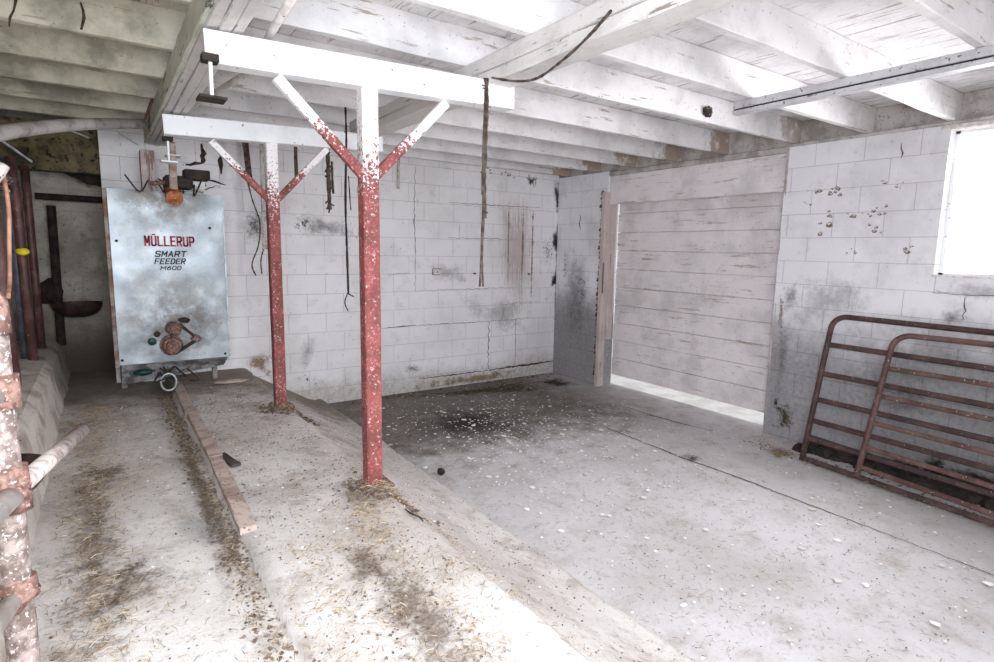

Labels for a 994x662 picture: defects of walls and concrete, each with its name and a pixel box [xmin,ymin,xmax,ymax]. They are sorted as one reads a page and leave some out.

crack [388,167,552,379]
water stain [521,214,586,316]
peeling [846,204,888,233]
crack [932,292,994,319]
crack [519,397,993,575]